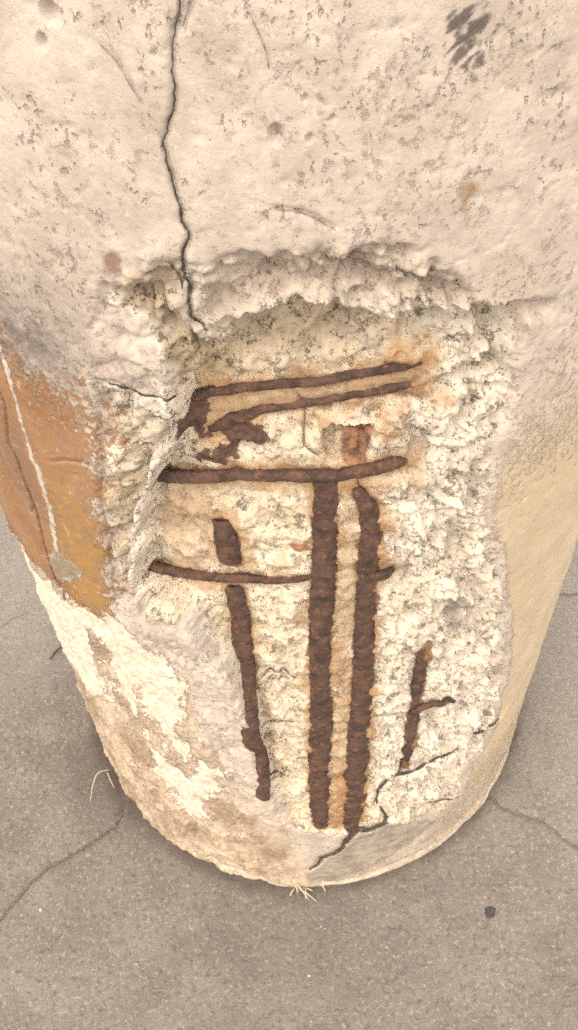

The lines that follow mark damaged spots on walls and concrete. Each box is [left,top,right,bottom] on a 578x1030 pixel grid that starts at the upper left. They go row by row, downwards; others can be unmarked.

crack [99,43,142,104]
crack [162,0,205,341]
damp [0,345,83,582]
spalling [12,235,536,837]
rust [158,322,453,827]
crack [308,718,500,870]